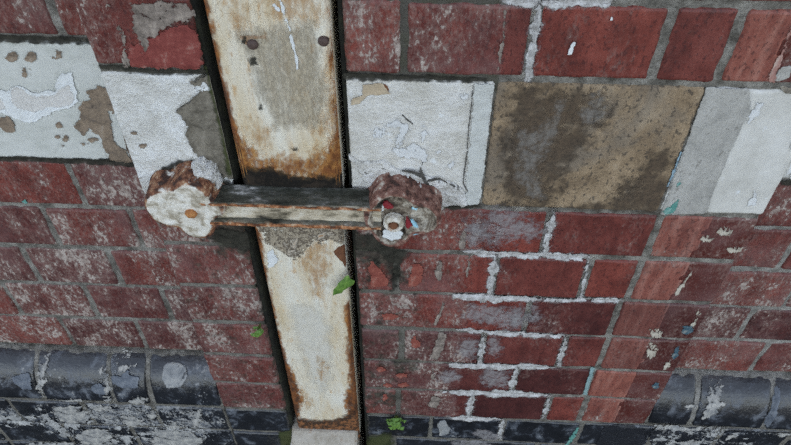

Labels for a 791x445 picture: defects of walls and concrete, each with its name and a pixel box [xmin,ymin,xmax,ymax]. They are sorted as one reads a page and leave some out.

peeling [0,52,132,163]
flaking render [116,0,233,179]
corrosion [204,0,342,180]
peeling [351,83,390,105]
leakage [459,1,612,277]
leakage [578,149,677,213]
peeling [660,87,764,215]
peeling [774,66,791,94]
corrosion [255,226,360,440]
leakage [428,302,567,440]
leakage [452,254,623,328]